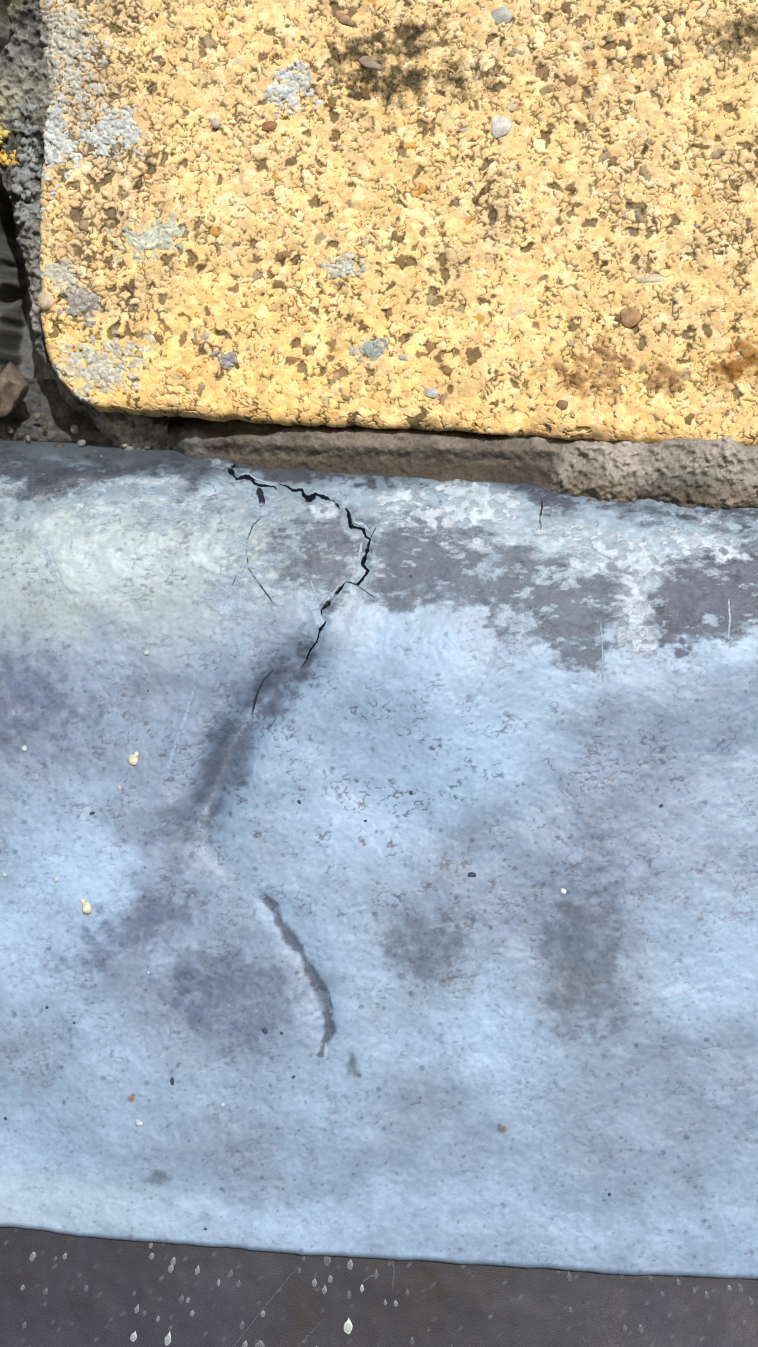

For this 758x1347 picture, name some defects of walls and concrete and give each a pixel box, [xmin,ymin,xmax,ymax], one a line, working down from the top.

crack [227,463,376,715]